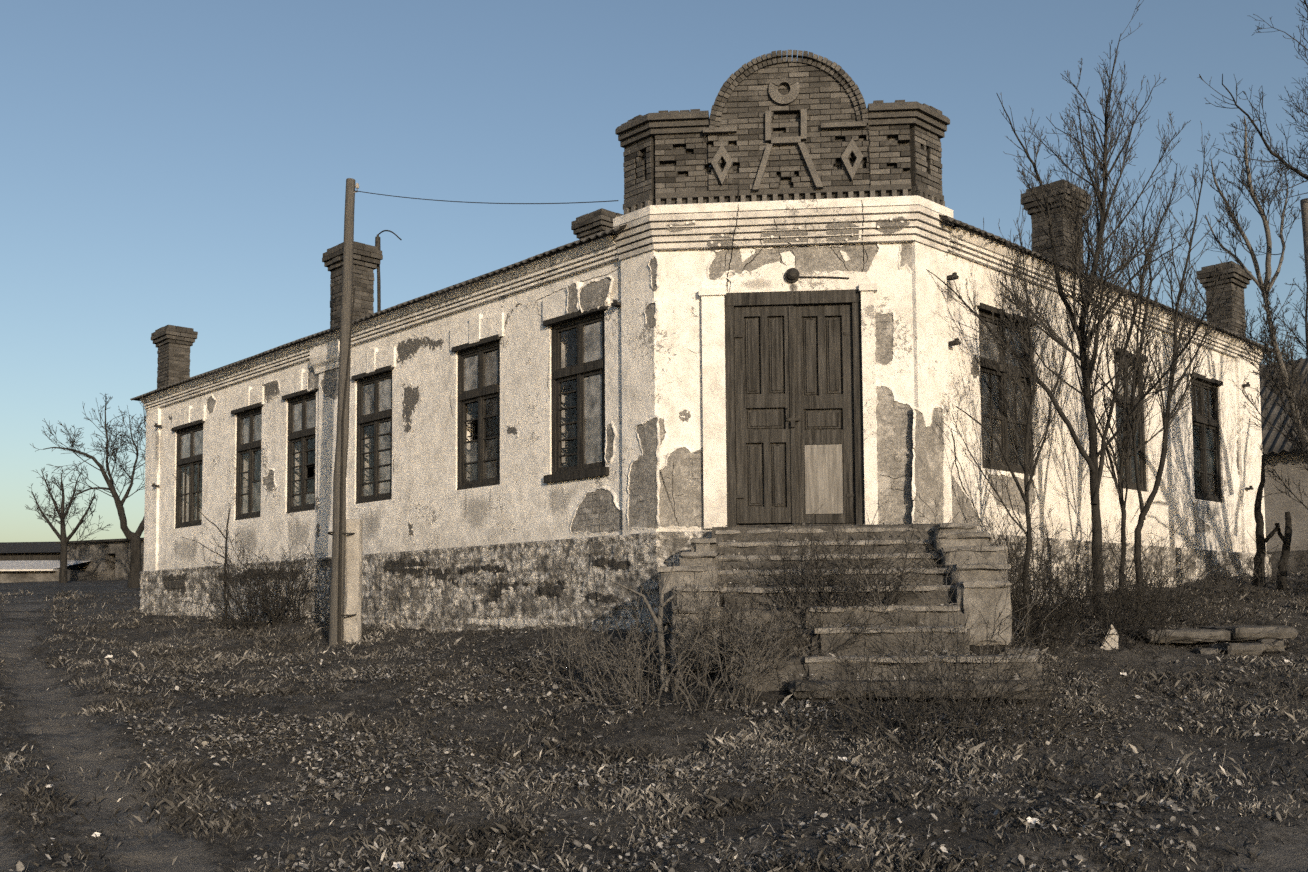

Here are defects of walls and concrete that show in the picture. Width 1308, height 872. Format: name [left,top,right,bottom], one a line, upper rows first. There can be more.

peeling [706,217,903,281]
peeling [897,242,918,274]
peeling [566,275,614,314]
peeling [307,366,339,401]
peeling [396,335,445,367]
peeling [874,311,897,365]
peeling [971,353,981,382]
peeling [402,383,422,433]
peeling [569,415,704,536]
peeling [876,383,980,529]
peeling [985,471,1036,516]